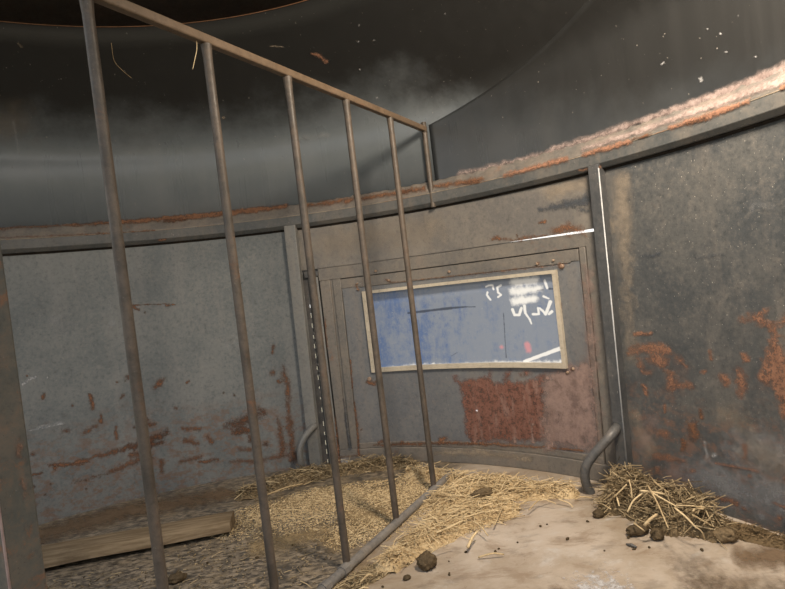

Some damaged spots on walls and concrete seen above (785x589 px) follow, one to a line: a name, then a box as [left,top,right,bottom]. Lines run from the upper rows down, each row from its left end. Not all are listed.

corrosion [668,99,749,129]
corrosion [307,176,483,207]
corrosion [503,156,568,178]
corrosion [583,134,650,157]
corrosion [121,203,288,241]
corrosion [628,331,693,391]
corrosion [742,308,785,419]
corrosion [263,368,297,462]
corrosion [374,361,598,452]
corrosion [32,426,140,487]